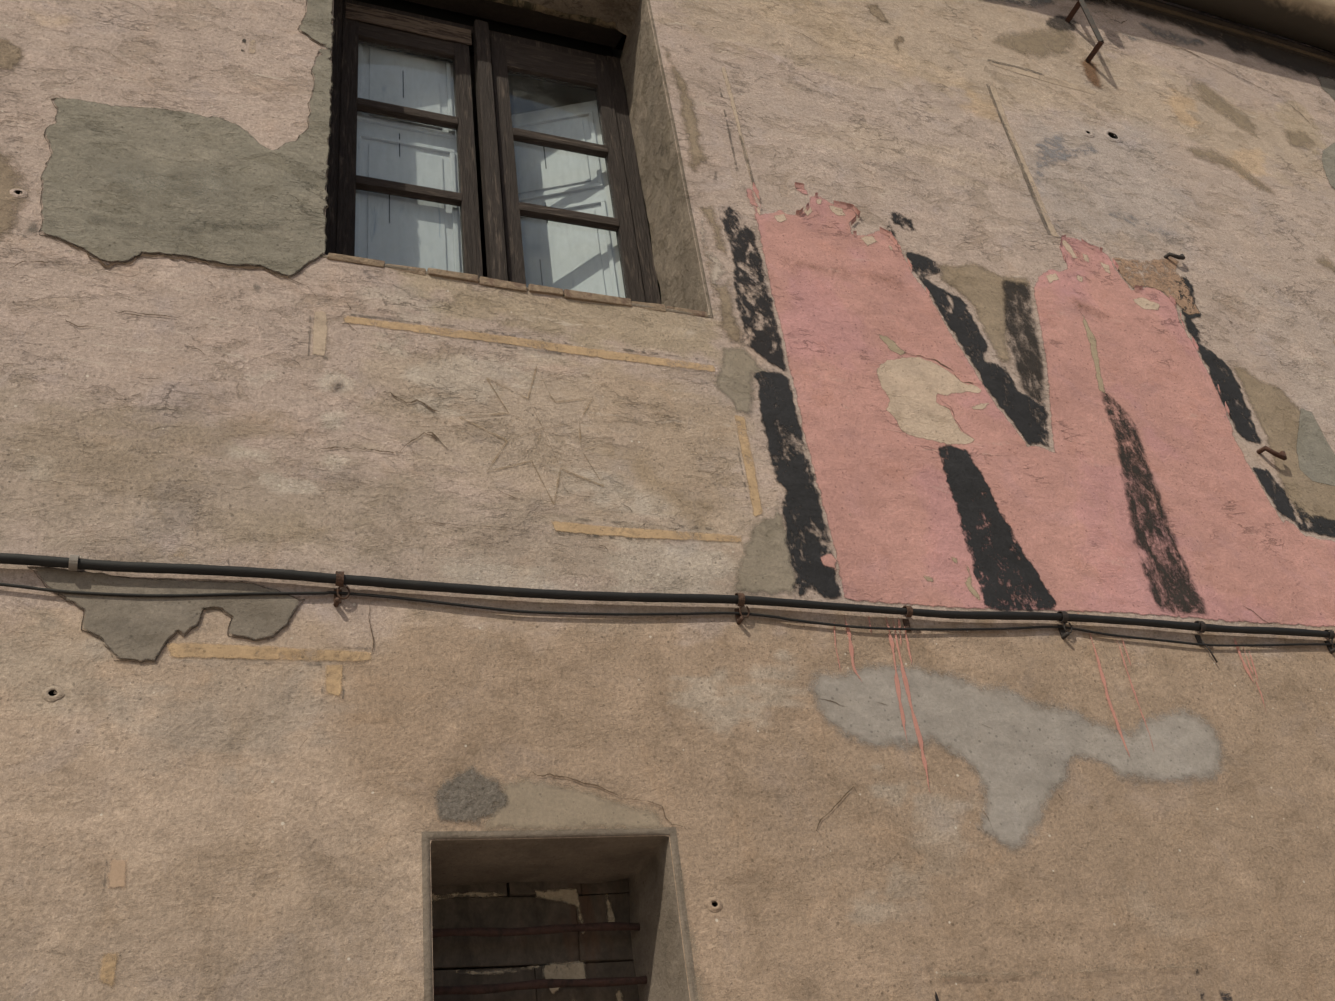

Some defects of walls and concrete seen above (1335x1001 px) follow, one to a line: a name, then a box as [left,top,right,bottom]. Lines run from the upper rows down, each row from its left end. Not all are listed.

rust [1046,15,1077,30]
flaking render [0,38,22,69]
rust [1083,61,1100,86]
flaking render [0,154,28,235]
peeling [877,335,989,444]
crack [527,772,680,826]